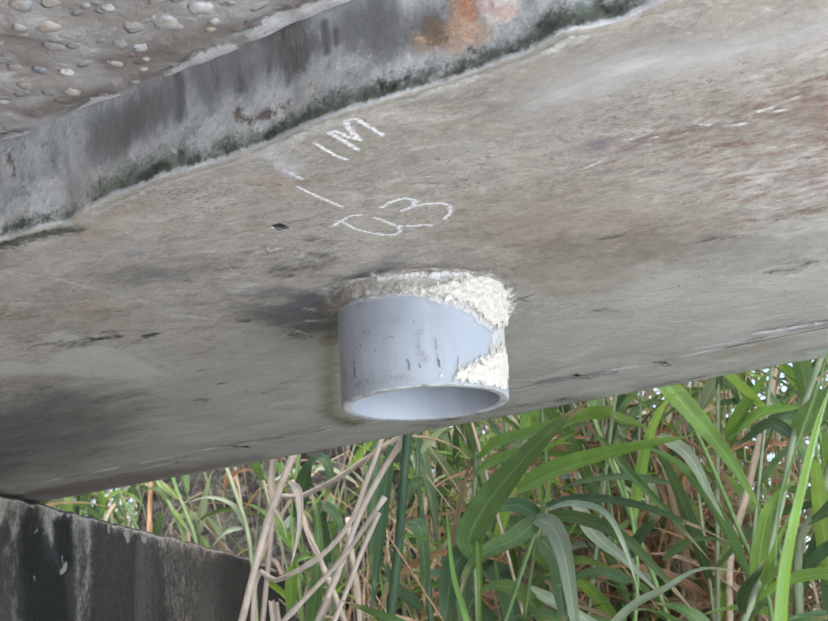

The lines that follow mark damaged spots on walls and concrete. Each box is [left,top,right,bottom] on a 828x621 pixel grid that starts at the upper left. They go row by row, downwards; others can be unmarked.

water stain [197,1,429,101]
rust [415,0,518,53]
water stain [541,33,602,53]
water stain [93,72,185,159]
water stain [235,101,290,125]
water stain [0,502,166,621]
water stain [203,553,286,621]